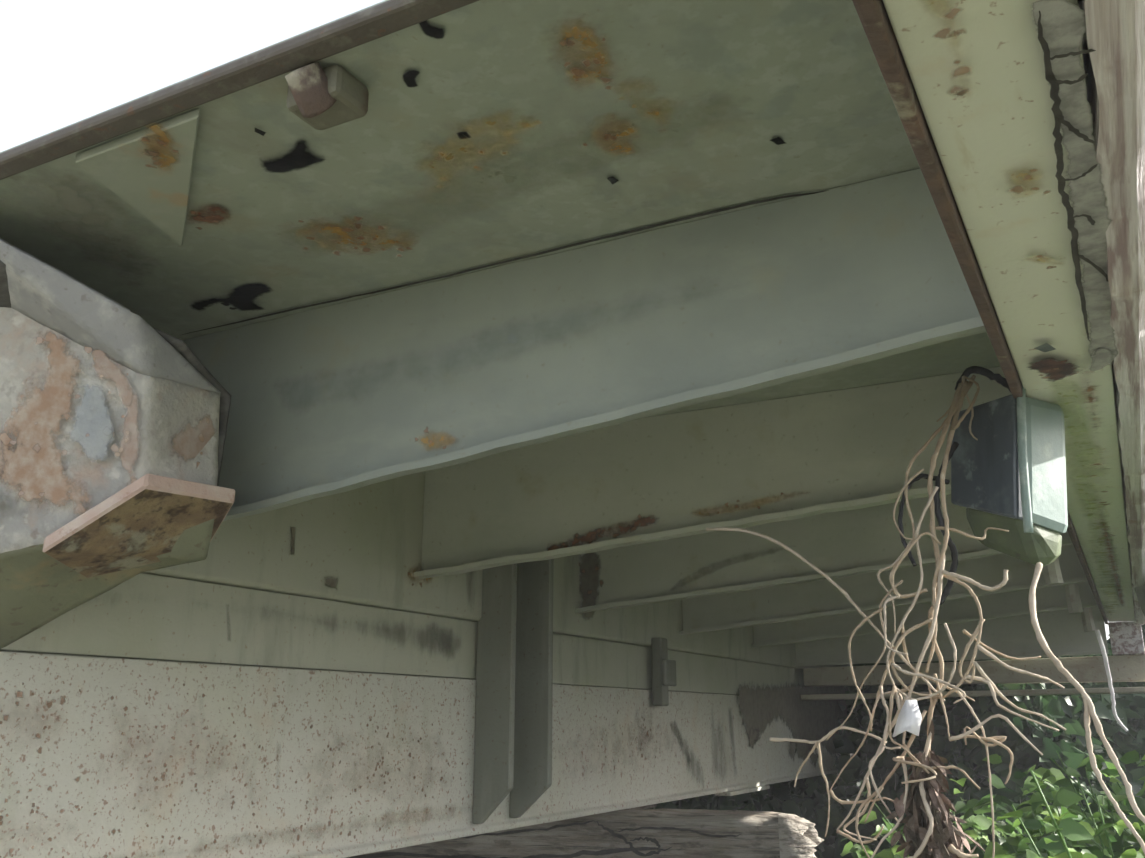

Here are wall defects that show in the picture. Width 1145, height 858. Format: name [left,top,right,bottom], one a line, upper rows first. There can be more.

peeling [262,141,325,173]
crack [1038,11,1108,342]
peeling [191,284,271,311]
rust [1028,358,1087,381]
peeling [0,332,139,515]
rust [547,514,657,551]
crack [346,820,741,858]